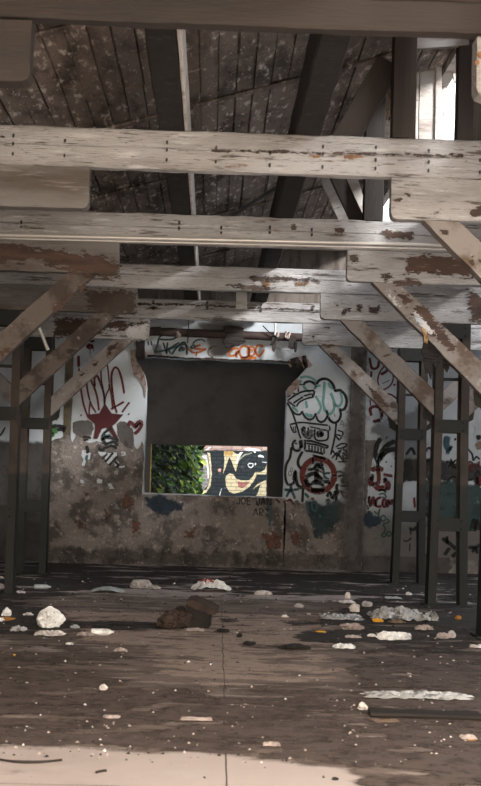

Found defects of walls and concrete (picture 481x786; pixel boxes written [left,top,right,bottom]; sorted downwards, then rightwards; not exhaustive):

peeling [212,149,464,160]
peeling [335,302,381,315]
peeling [380,253,481,354]
flaking render [48,420,346,570]